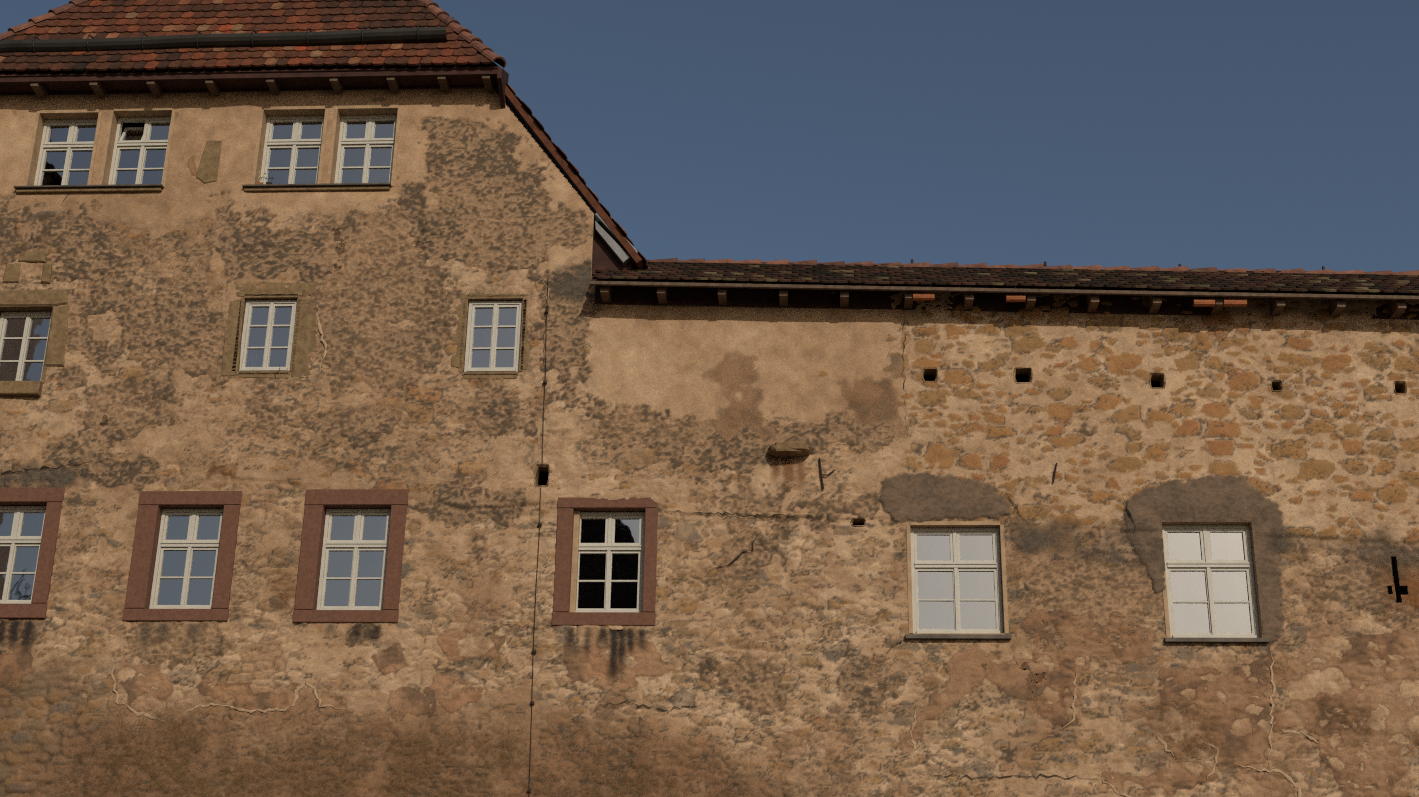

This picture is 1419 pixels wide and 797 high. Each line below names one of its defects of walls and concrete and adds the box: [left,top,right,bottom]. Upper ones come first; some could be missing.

flaking render [0,116,908,589]
damp [587,629,644,675]
crack [918,771,1097,779]